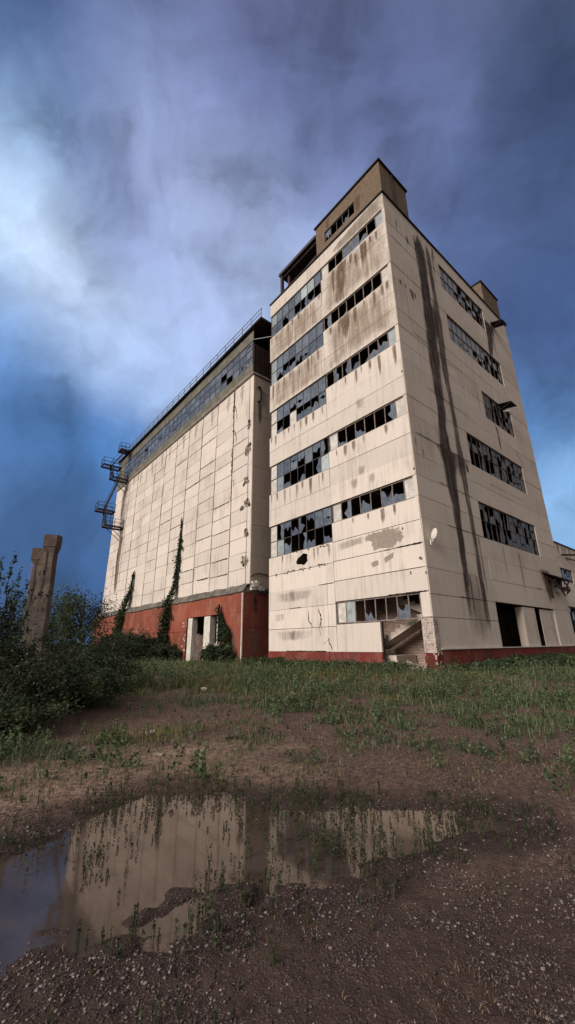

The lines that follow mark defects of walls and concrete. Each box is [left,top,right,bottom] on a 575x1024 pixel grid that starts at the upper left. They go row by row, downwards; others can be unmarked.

damp [329,232,491,626]
peeling [365,527,403,567]
crack [289,583,332,652]